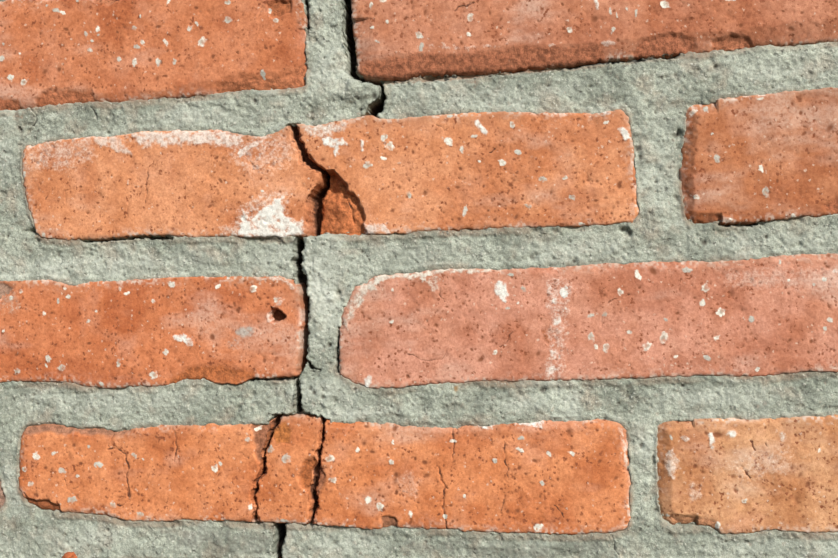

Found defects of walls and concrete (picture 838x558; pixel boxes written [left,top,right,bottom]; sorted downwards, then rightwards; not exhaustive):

crack [301,0,311,31]
crack [342,0,405,117]
crack [559,53,680,71]
crack [235,124,341,558]